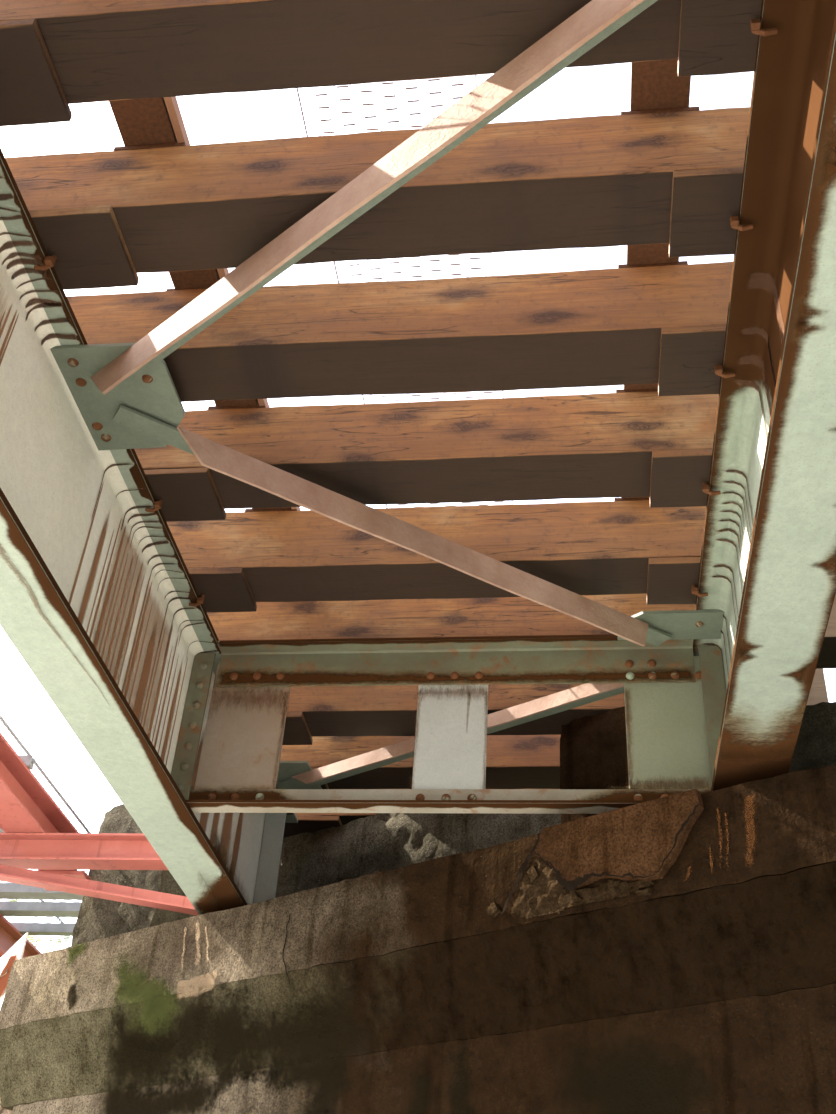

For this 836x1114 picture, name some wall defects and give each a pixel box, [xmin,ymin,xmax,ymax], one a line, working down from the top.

rust [0,148,88,365]
rust [695,0,836,795]
rust [116,449,157,508]
rust [0,463,703,915]
peeling [485,789,704,919]
rust [709,808,729,869]
water stain [103,986,364,1114]